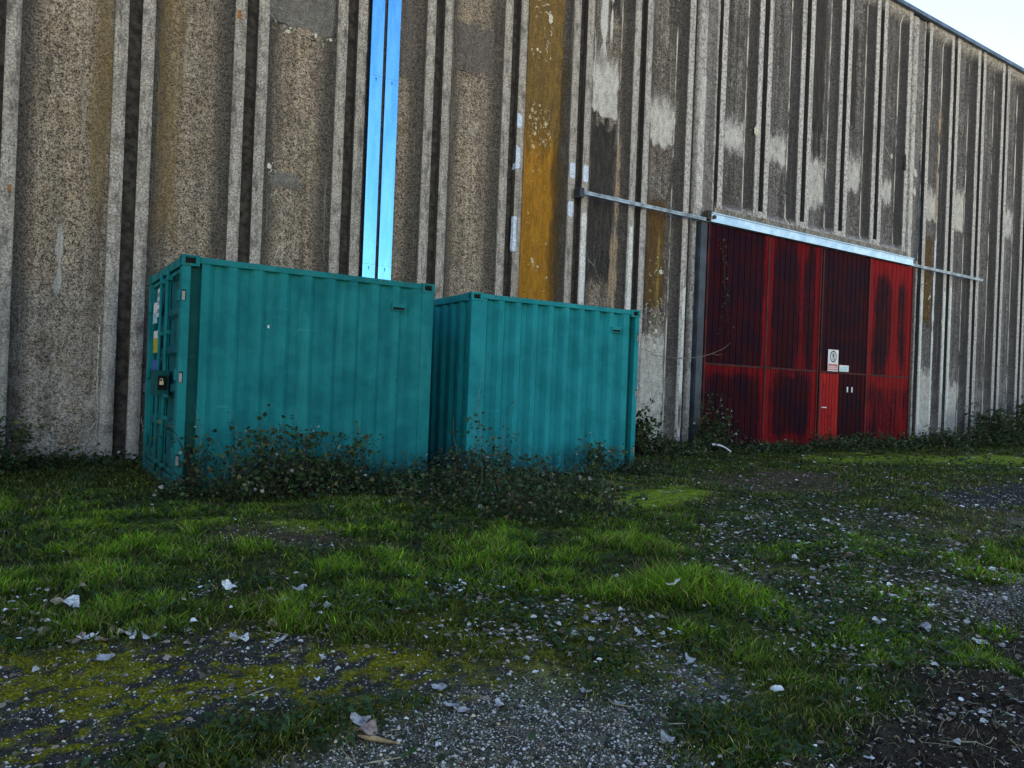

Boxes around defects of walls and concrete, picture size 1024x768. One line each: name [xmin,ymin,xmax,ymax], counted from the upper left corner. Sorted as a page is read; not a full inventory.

corrosion [518,0,566,301]
leakage [579,0,621,304]
corrosion [644,197,666,319]
leakage [650,98,675,149]
leakage [695,75,707,210]
leakage [724,119,744,154]
leakage [809,0,827,209]
leakage [847,157,861,197]
leakage [850,28,859,126]
leakage [902,134,915,256]
leakage [926,190,937,222]
leakage [954,192,964,233]